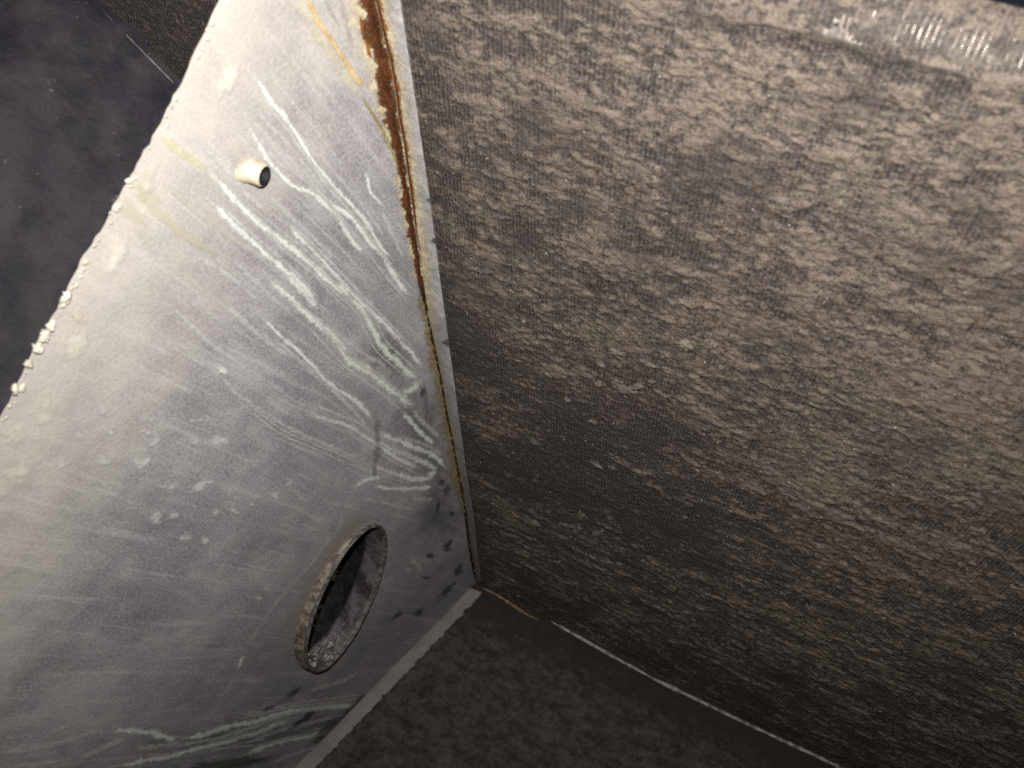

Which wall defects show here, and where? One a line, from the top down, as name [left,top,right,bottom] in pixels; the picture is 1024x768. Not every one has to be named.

damp [1,259,89,442]
damp [125,170,156,192]
damp [137,74,448,511]
corrosion [297,0,464,487]